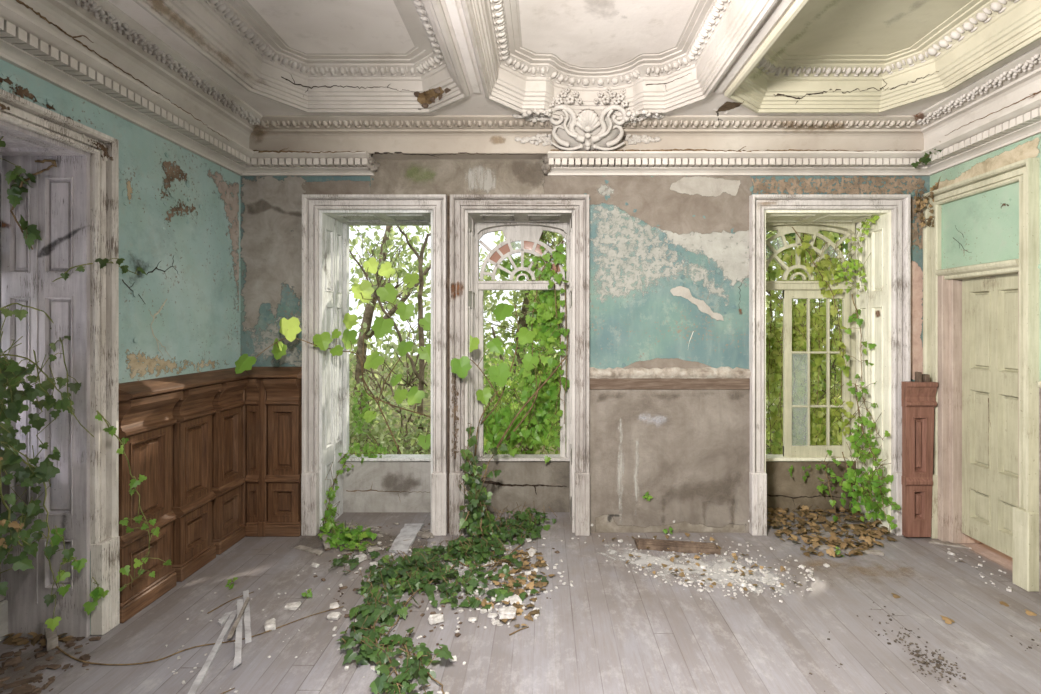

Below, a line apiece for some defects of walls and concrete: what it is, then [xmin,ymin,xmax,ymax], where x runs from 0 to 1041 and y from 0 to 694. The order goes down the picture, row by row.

peeling [0,71,114,161]
crack [16,0,229,141]
crack [281,75,412,96]
spalling [414,87,451,110]
crack [775,71,939,103]
peeling [160,152,202,230]
spalling [200,134,1041,380]
crack [122,256,178,358]
peeling [119,338,227,380]
crack [482,480,567,495]